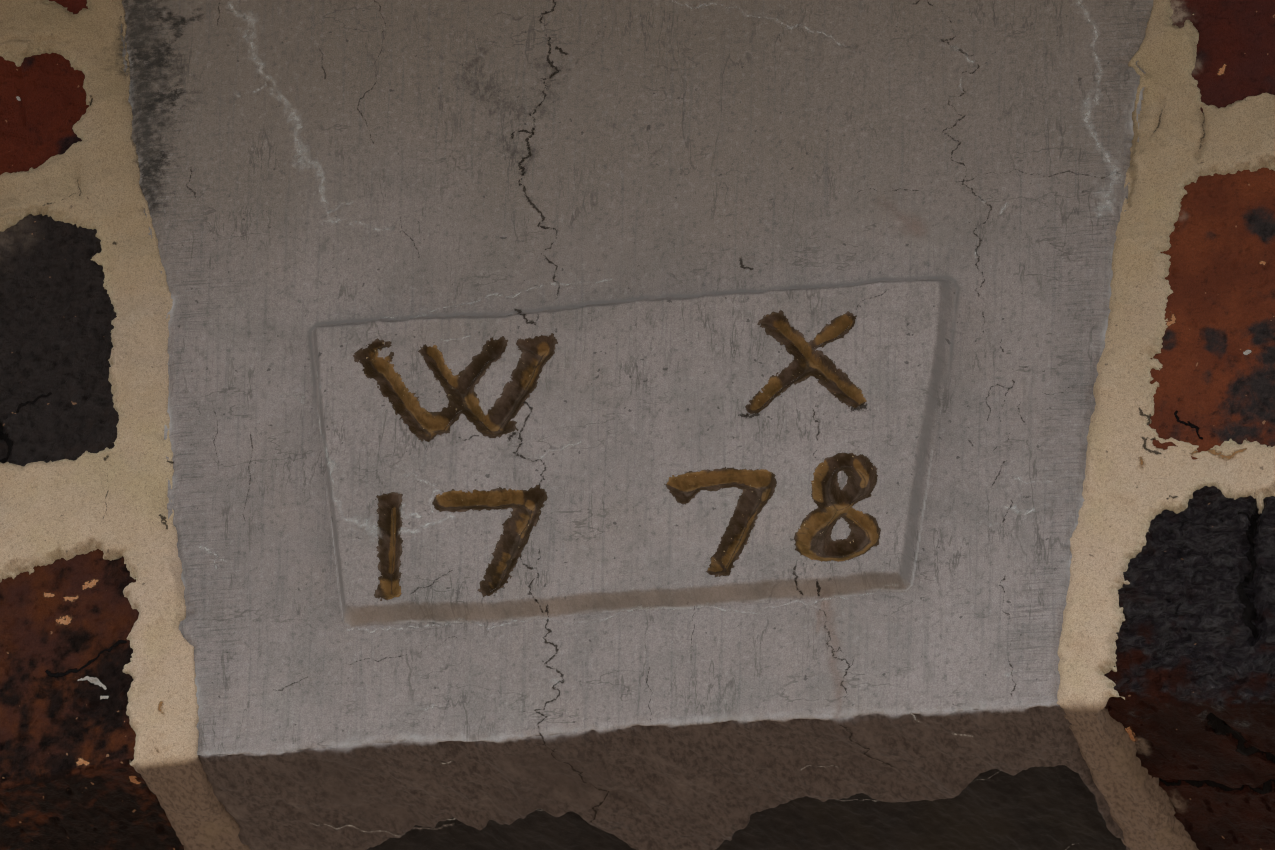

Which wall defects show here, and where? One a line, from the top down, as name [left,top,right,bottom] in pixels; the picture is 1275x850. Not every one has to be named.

crack [459,401,546,486]
crack [515,309,536,325]
crack [511,0,567,294]
crack [913,1,1120,522]
crack [521,550,609,822]